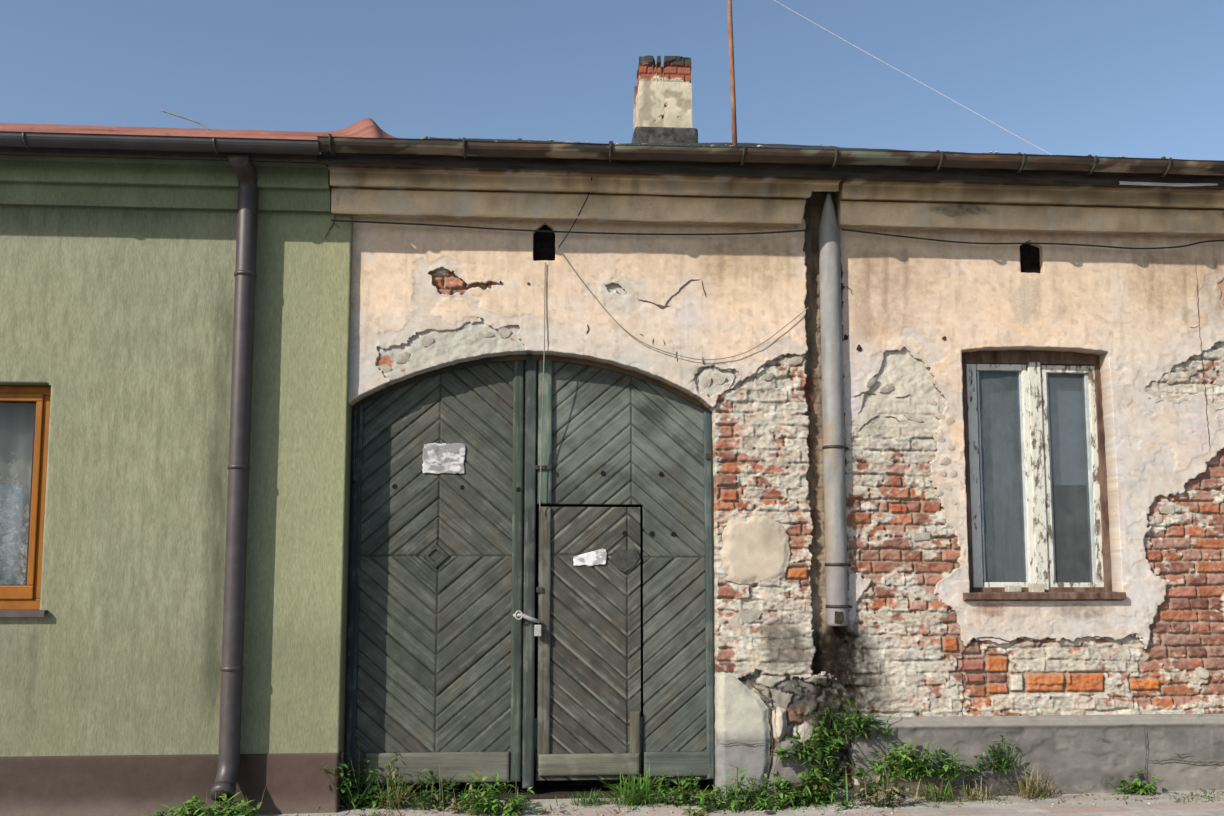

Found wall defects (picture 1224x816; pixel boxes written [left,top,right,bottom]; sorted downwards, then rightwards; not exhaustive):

flaking render [429,268,503,295]
crack [638,279,706,309]
peeling [376,318,530,387]
crack [640,334,792,392]
crack [1192,269,1210,451]
flaking render [691,342,1224,797]
leakage [764,620,880,783]